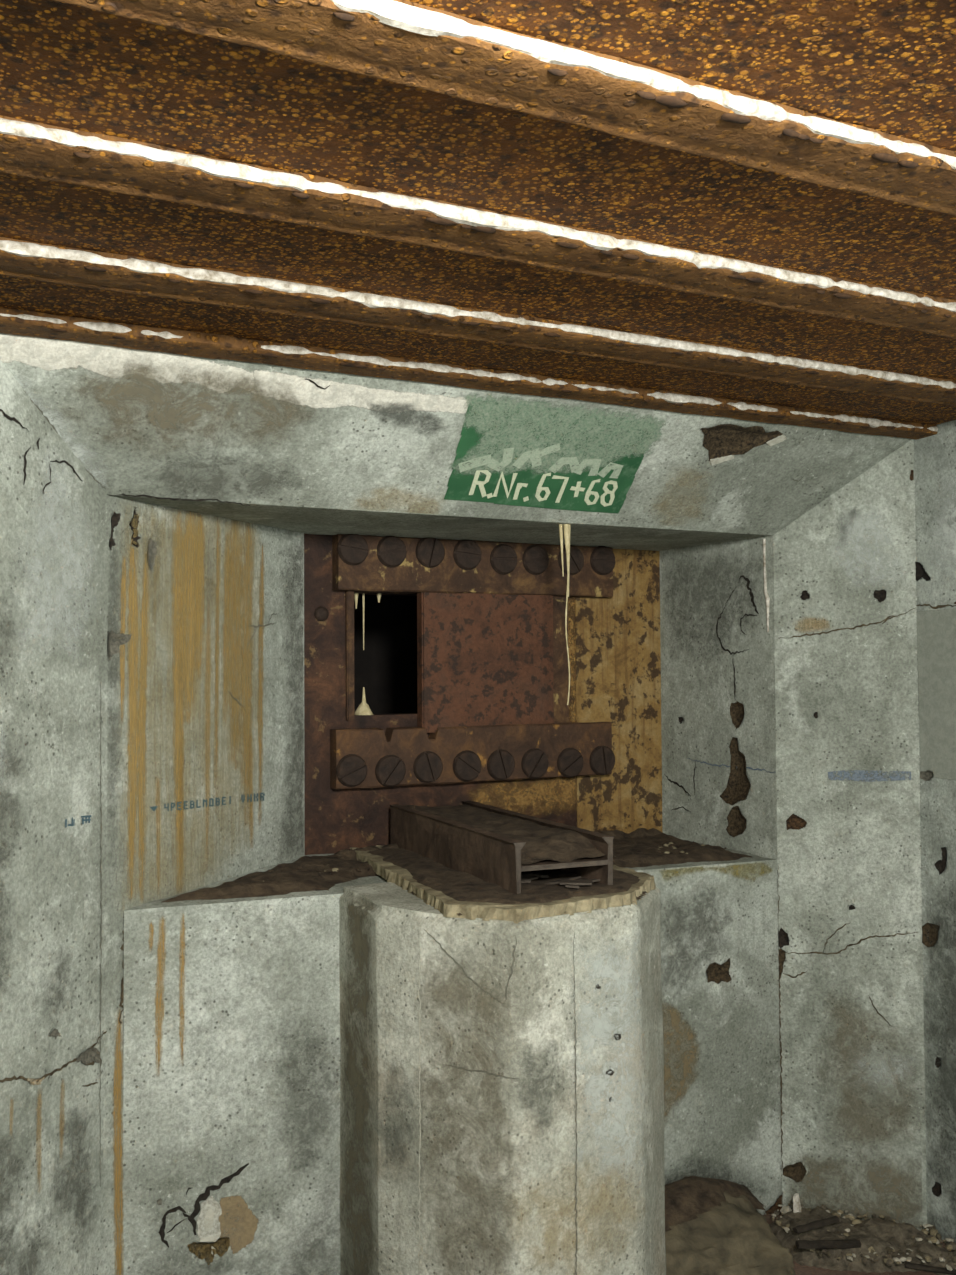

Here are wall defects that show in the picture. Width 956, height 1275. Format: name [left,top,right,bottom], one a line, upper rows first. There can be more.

rust [426,217,496,234]
crack [0,390,250,506]
spalling [701,424,787,465]
rust [172,511,264,884]
spalling [720,701,751,837]
crack [0,707,124,1187]
leakage [0,1142,42,1275]
rust [113,1014,123,1275]
crack [159,1163,249,1247]
peeling [187,1195,259,1265]
leakage [288,893,405,1275]
leakage [790,1158,922,1228]